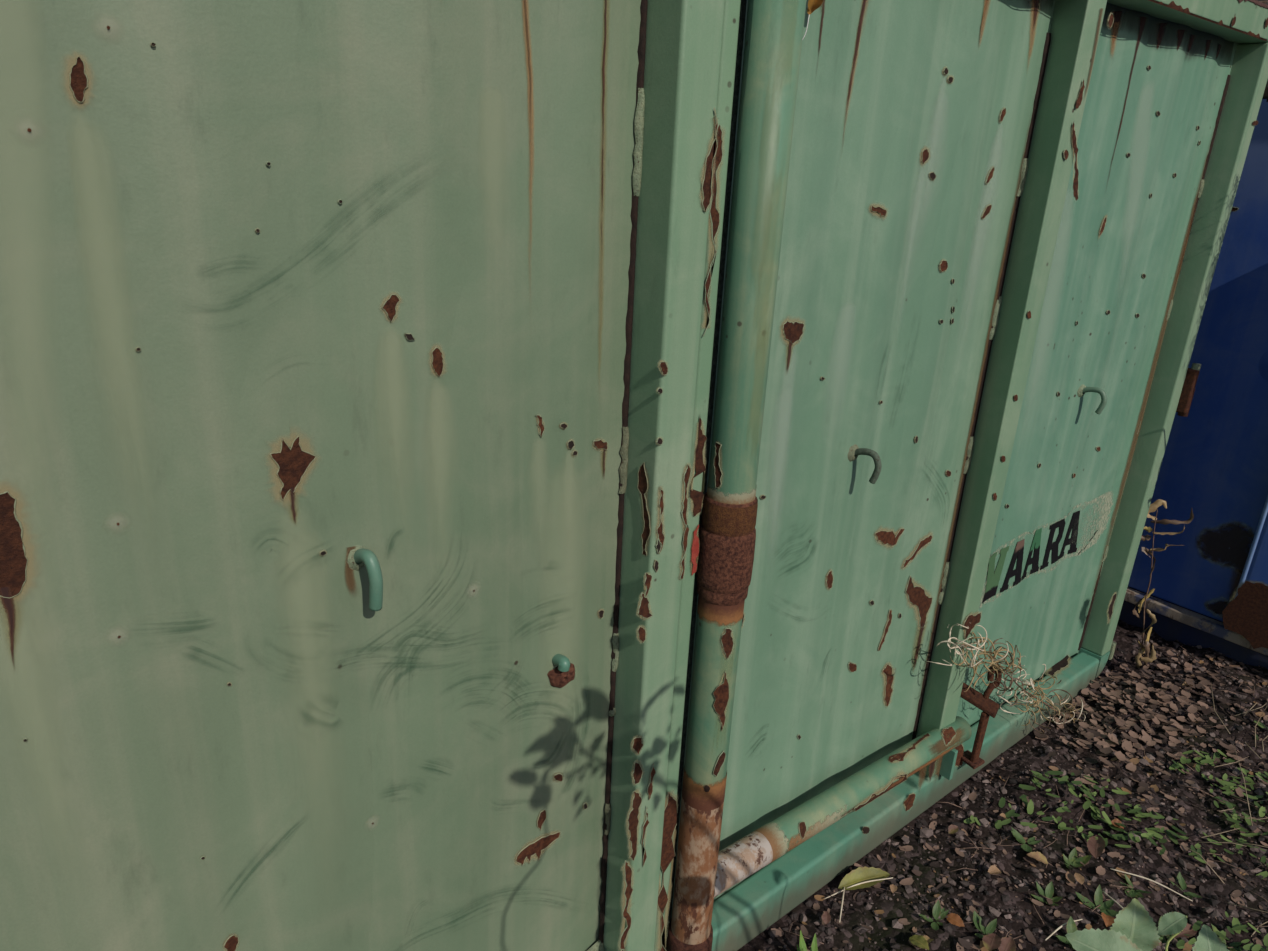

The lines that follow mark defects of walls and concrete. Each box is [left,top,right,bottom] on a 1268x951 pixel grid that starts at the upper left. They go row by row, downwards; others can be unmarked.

rust [701,108,723,337]
rust [0,485,33,664]
rust [269,435,316,522]
rust [679,418,757,579]
rust [875,528,905,546]
rust [902,161,1023,668]
rust [1105,191,1199,551]
rust [1197,523,1268,649]
rust [515,831,560,866]
rust [619,736,643,951]
rust [657,766,727,951]
rust [842,726,964,816]